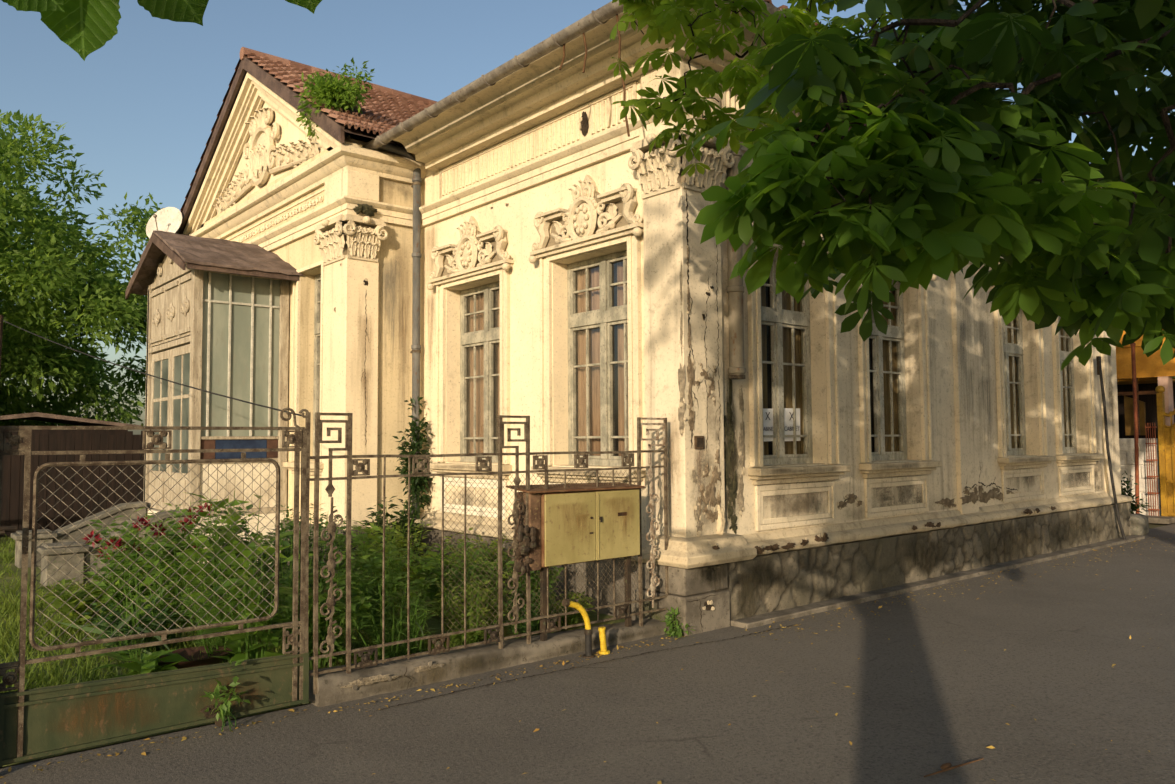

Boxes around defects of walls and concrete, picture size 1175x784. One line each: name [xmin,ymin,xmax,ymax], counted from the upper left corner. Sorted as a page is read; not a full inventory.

crack [686,190,721,490]
spalling [692,449,721,536]
damp [726,411,738,508]
peeling [737,385,746,517]